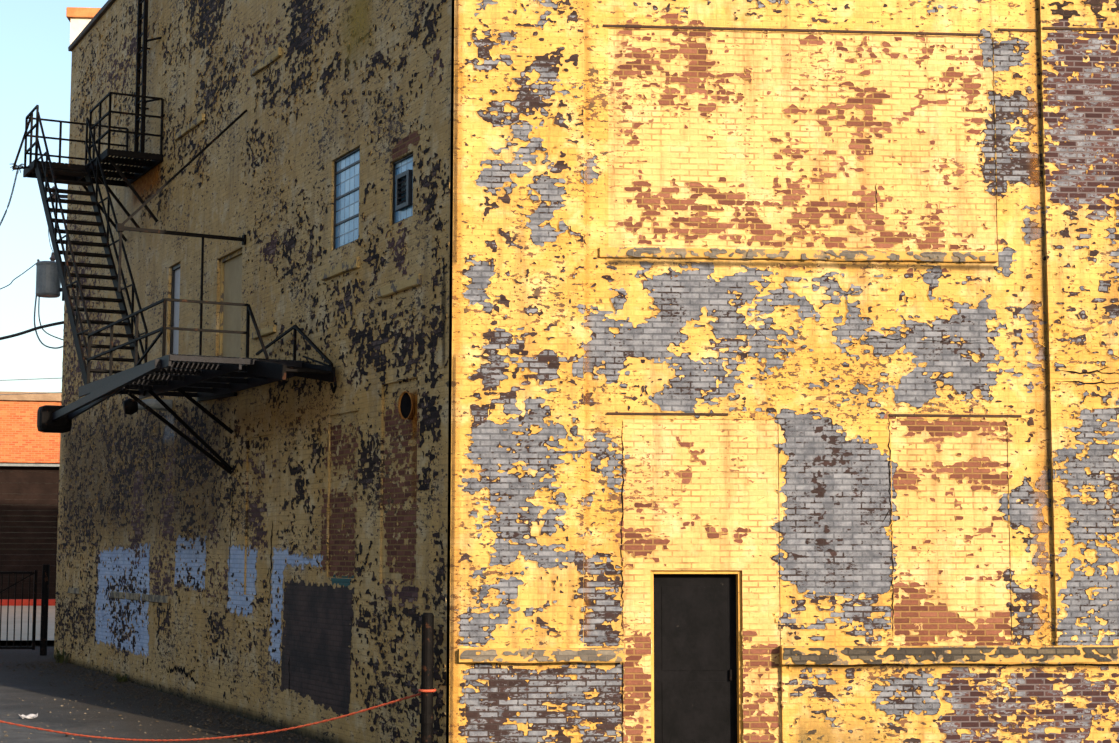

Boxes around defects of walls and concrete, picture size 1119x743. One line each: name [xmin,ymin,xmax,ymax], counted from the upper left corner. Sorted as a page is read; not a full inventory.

peeling [54,0,450,743]
peeling [453,0,1119,743]